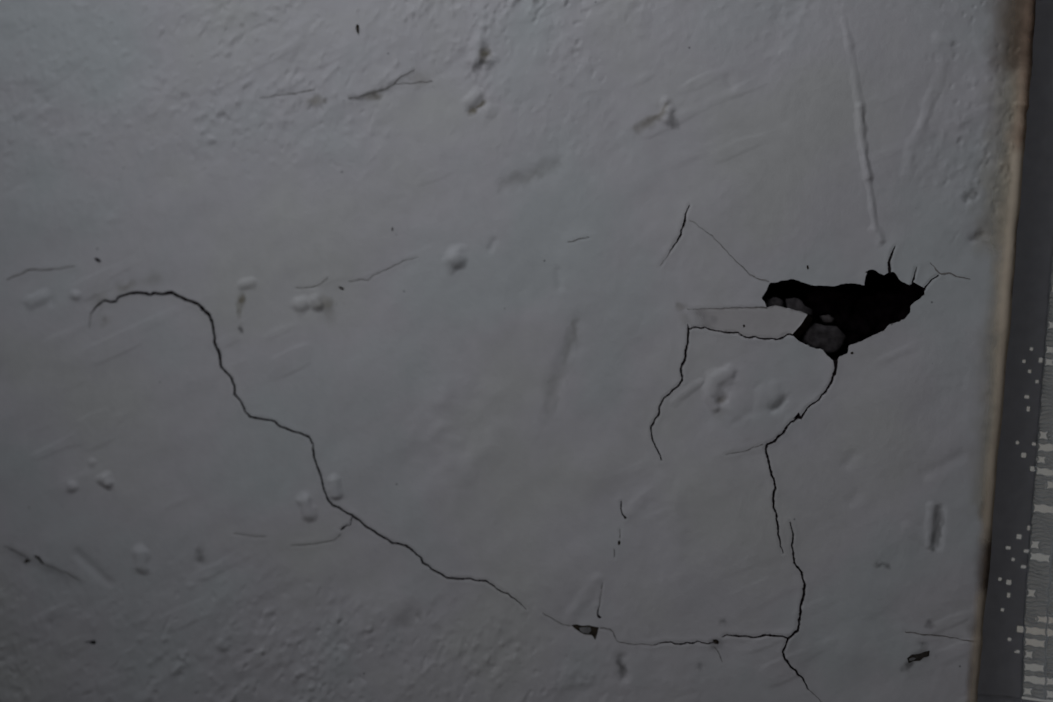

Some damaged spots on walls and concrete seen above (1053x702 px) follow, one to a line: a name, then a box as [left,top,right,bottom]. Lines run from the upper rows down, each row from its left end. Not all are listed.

crack [89,291,571,626]
crack [597,360,838,702]
crack [650,205,793,460]
spalling [762,270,924,360]
crack [887,247,969,290]